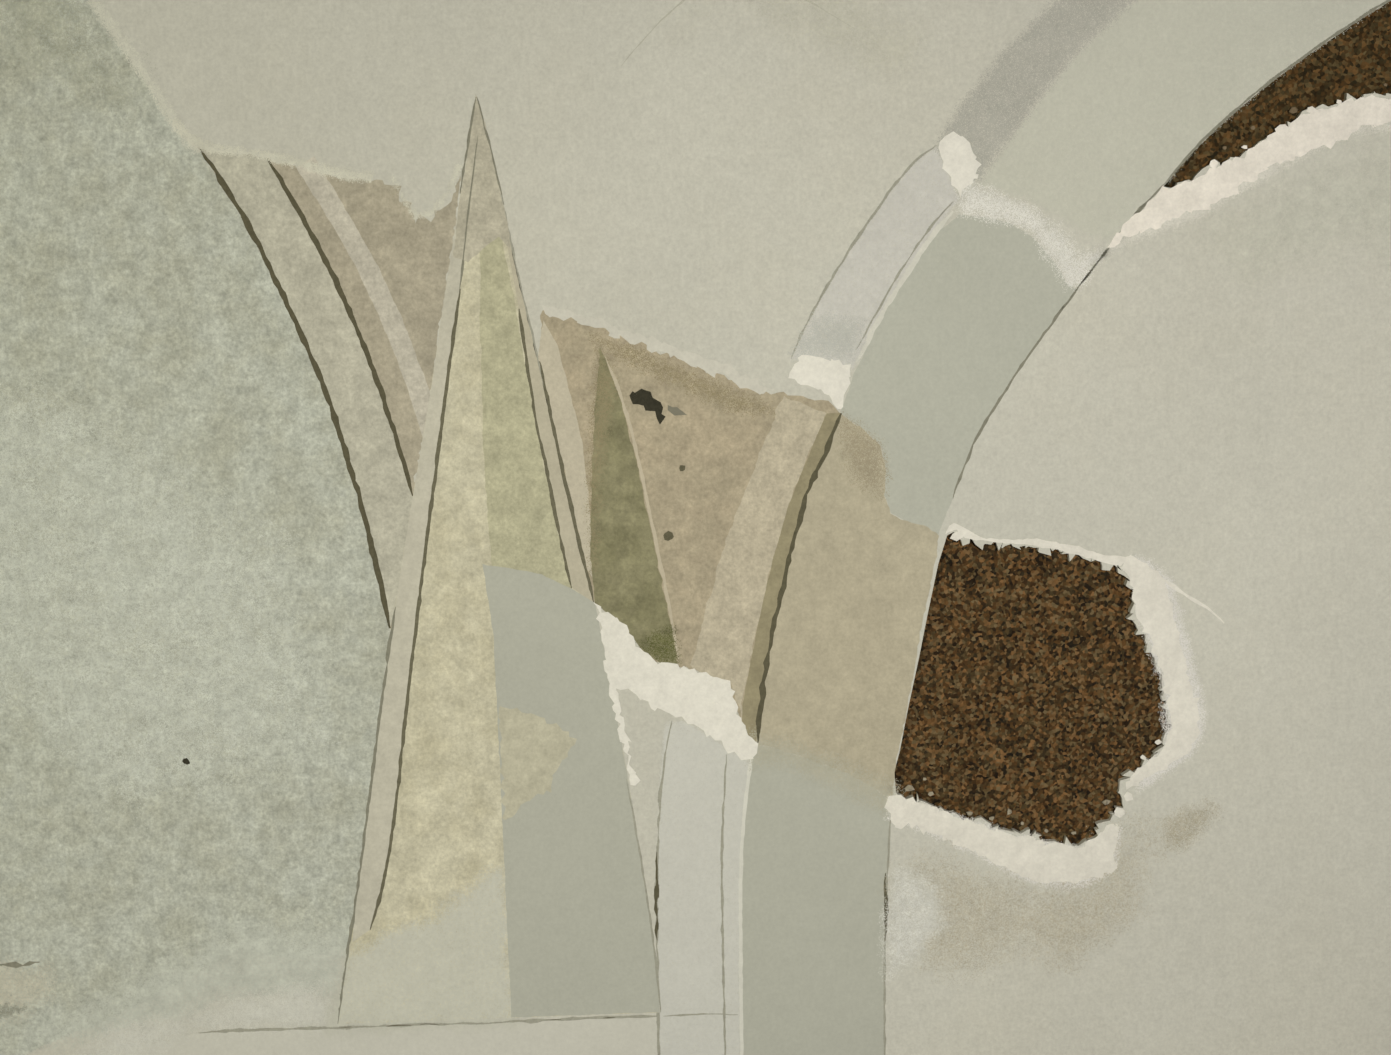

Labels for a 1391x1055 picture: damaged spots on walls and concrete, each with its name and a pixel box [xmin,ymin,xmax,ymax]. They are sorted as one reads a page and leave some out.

spalling [1099,0,1391,260]
spalling [629,389,686,424]
spalling [883,523,1224,893]